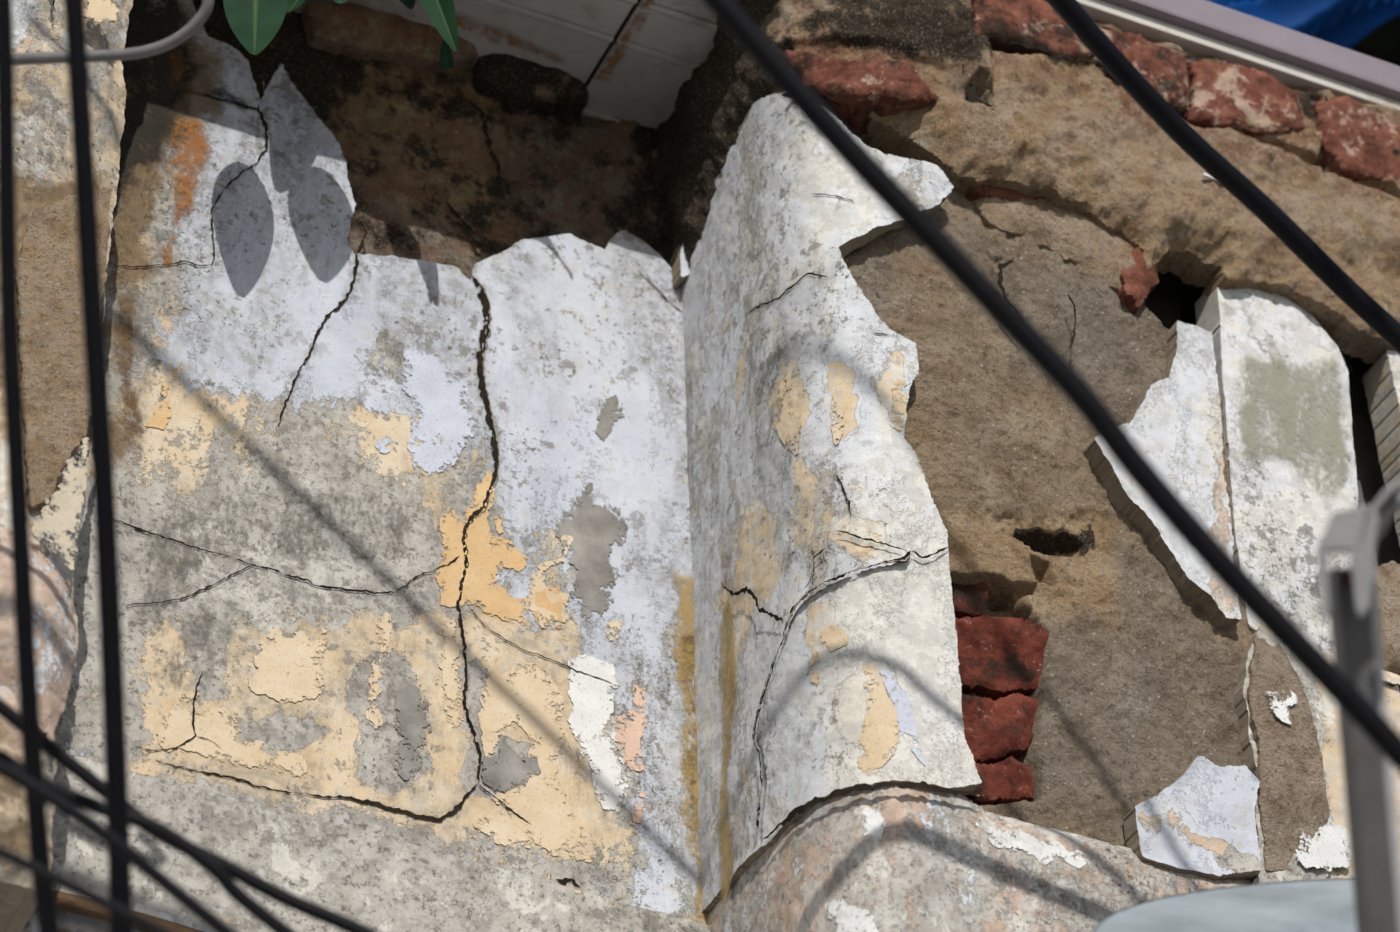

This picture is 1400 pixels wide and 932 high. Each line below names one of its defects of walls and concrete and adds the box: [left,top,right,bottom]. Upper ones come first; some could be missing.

crack [117,68,268,268]
peeling [156,690,307,777]
peeling [248,626,329,703]
crack [276,205,367,428]
crack [117,277,611,824]
crack [467,100,501,189]
spalling [193,0,784,289]
peeling [363,471,647,863]
peeling [596,395,625,440]
crack [721,474,982,839]
spalling [736,0,1400,425]
flaking render [843,226,1350,872]